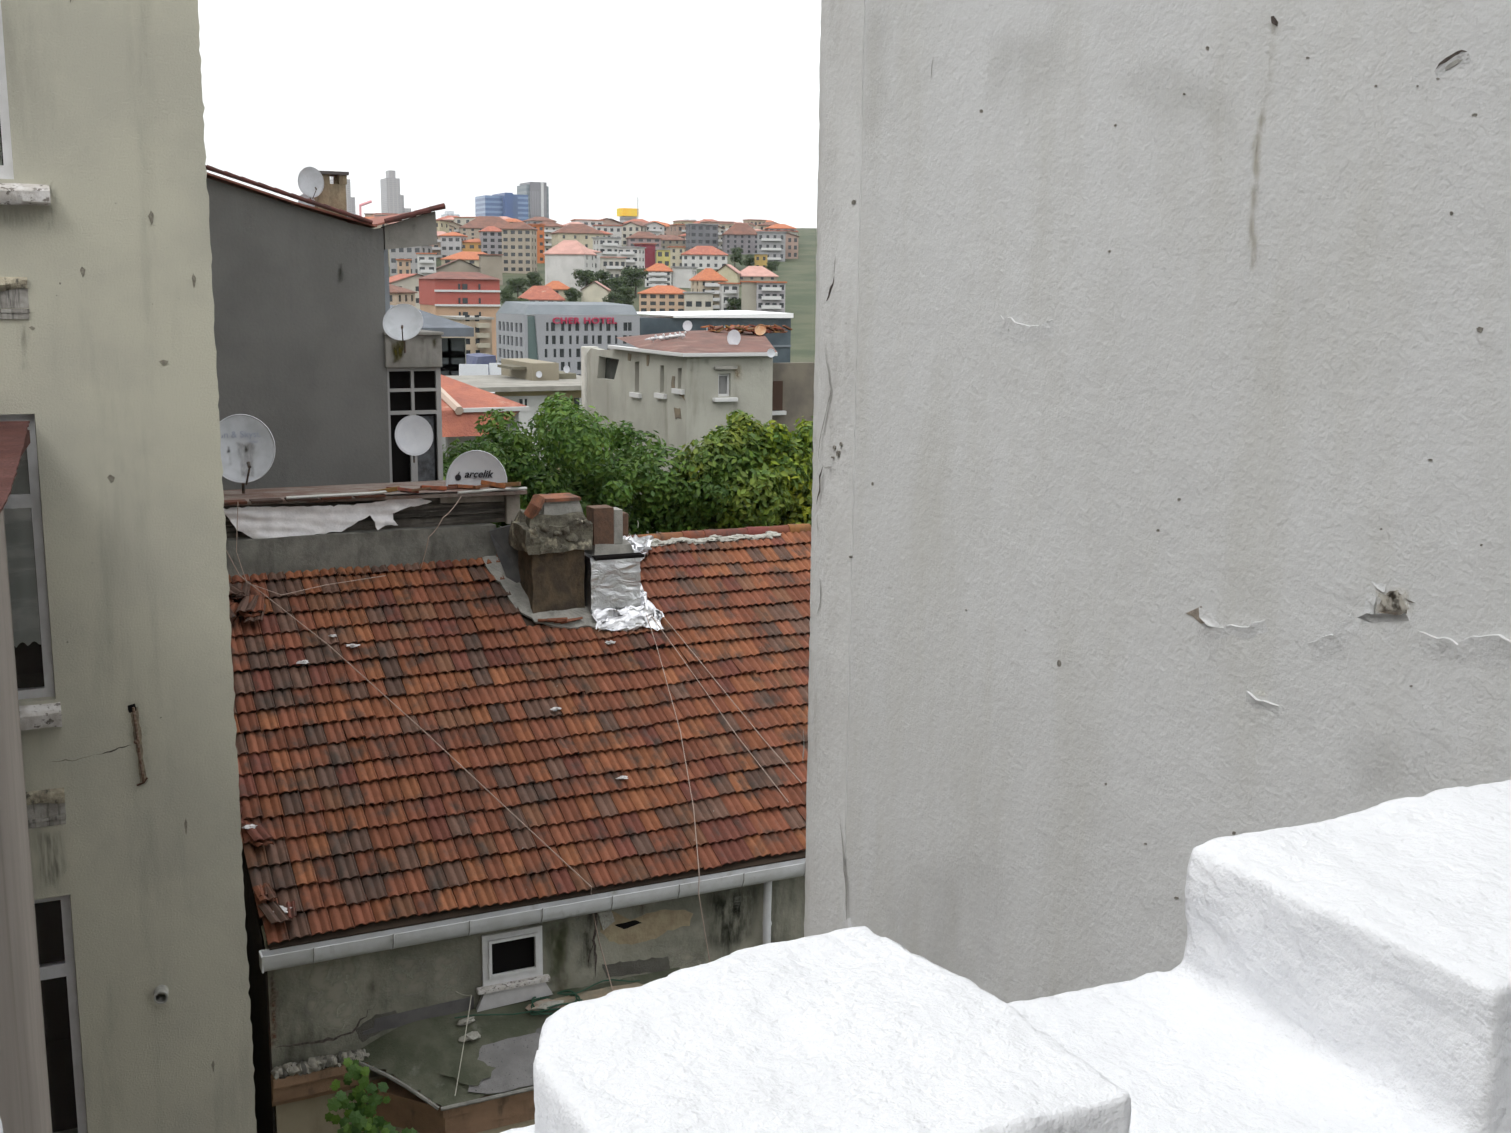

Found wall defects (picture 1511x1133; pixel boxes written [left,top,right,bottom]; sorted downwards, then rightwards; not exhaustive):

spalling [1357,582,1414,622]
flaking render [1186,606,1268,640]
spalling [597,906,693,978]